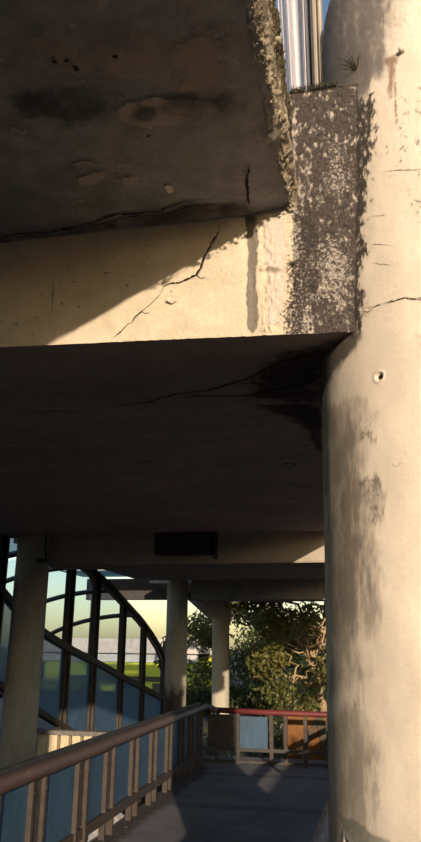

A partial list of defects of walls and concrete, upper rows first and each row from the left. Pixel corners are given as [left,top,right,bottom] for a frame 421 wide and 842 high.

corrosion [386,46,405,90]
leakage [0,0,390,337]
crack [114,232,219,337]
crack [363,297,421,312]
crack [119,345,332,407]
leakage [252,403,323,450]